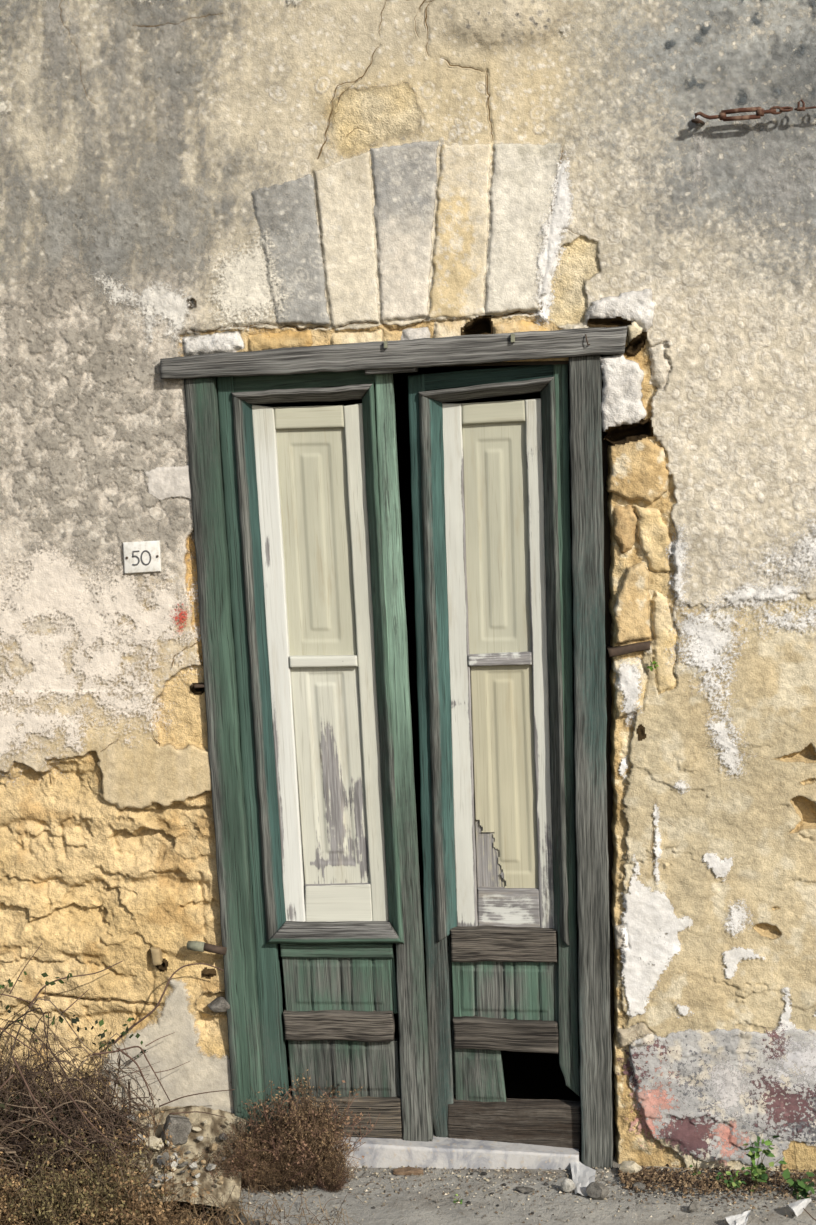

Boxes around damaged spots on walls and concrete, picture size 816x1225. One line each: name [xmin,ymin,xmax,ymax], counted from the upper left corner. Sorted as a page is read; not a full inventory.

water stain [0,0,260,612]
spalling [95,227,473,357]
crack [318,0,493,159]
water stain [586,0,816,293]
spalling [0,525,230,1129]
flaking render [491,236,816,1172]